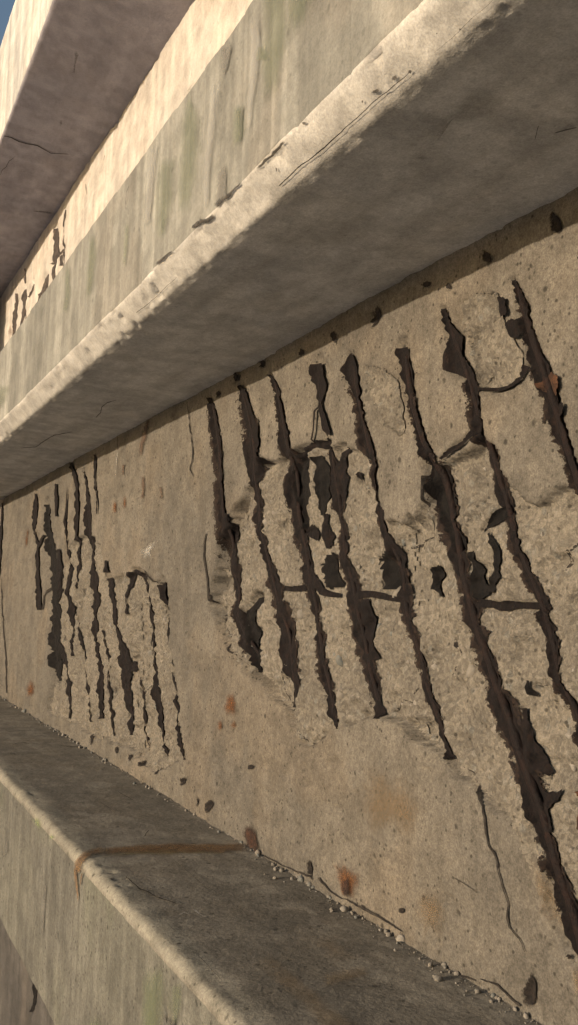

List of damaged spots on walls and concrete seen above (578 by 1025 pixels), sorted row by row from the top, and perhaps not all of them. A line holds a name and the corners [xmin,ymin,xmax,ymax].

crack [1,136,62,172]
crack [279,75,407,186]
spalling [12,210,66,335]
spalling [371,306,381,327]
spalling [461,292,524,393]
spalling [49,536,180,774]
spalling [218,443,578,967]
rust [394,279,578,959]
rust [74,827,258,899]
crack [464,767,525,952]
crack [459,975,520,1006]
spalling [523,975,536,1006]